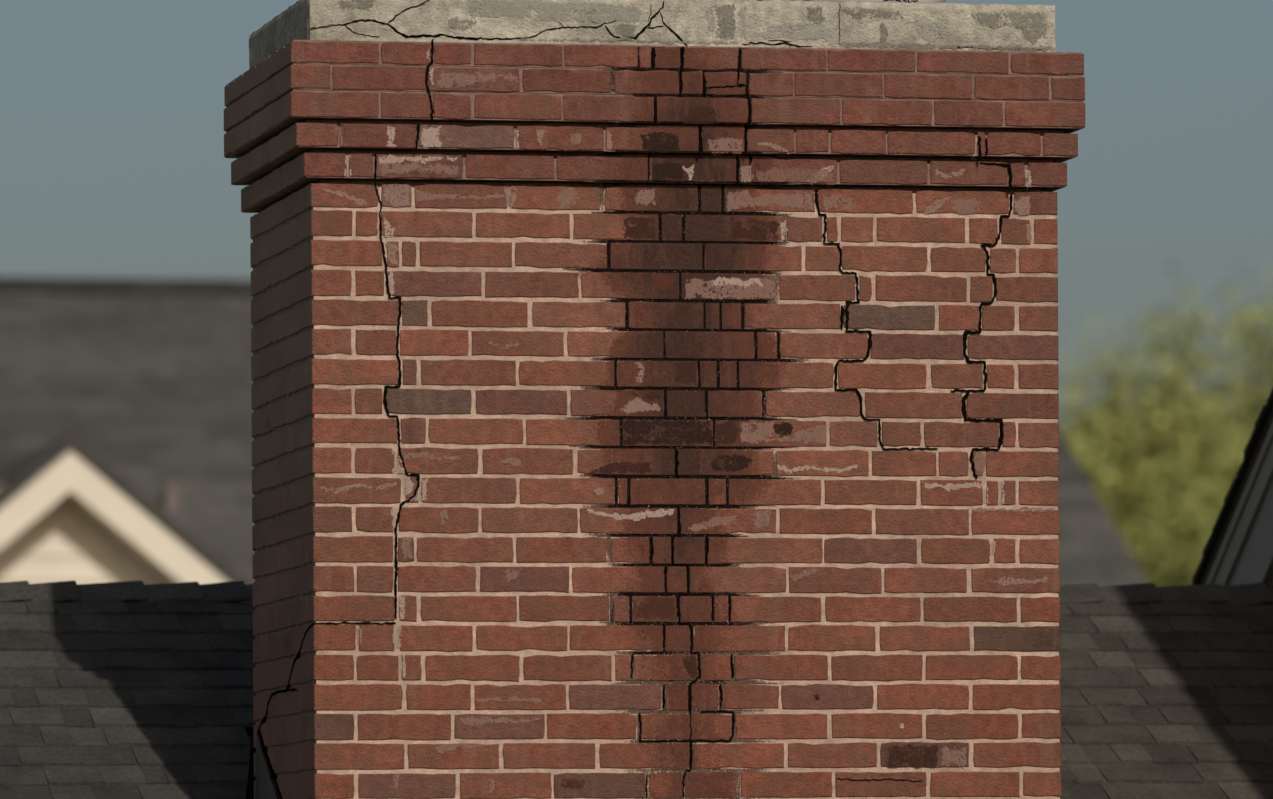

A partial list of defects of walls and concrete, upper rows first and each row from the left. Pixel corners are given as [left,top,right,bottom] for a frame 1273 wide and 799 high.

crack [310,0,841,186]
crack [257,153,420,734]
damp [505,0,858,799]
crack [815,190,938,450]
crack [951,136,1013,479]
crack [639,450,735,799]